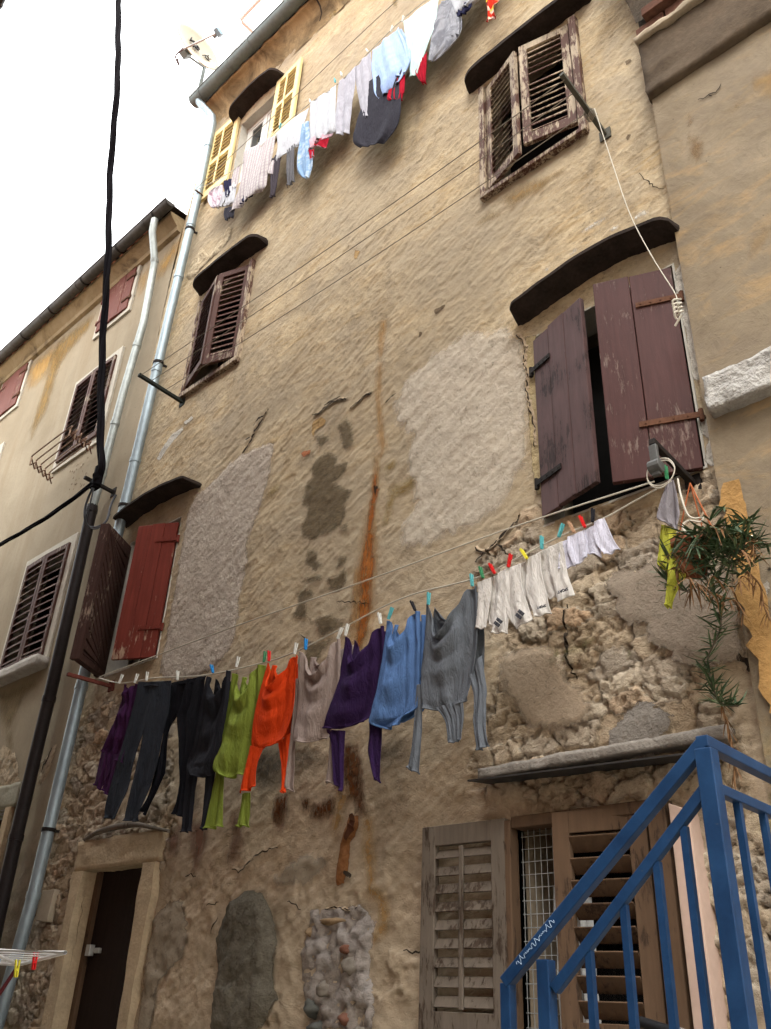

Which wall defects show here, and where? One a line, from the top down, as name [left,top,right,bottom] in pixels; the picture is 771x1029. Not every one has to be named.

crack [242,407,269,453]
leakage [338,421,353,449]
leakage [294,436,350,665]
corrosion [353,470,379,645]
flaking render [498,647,590,729]